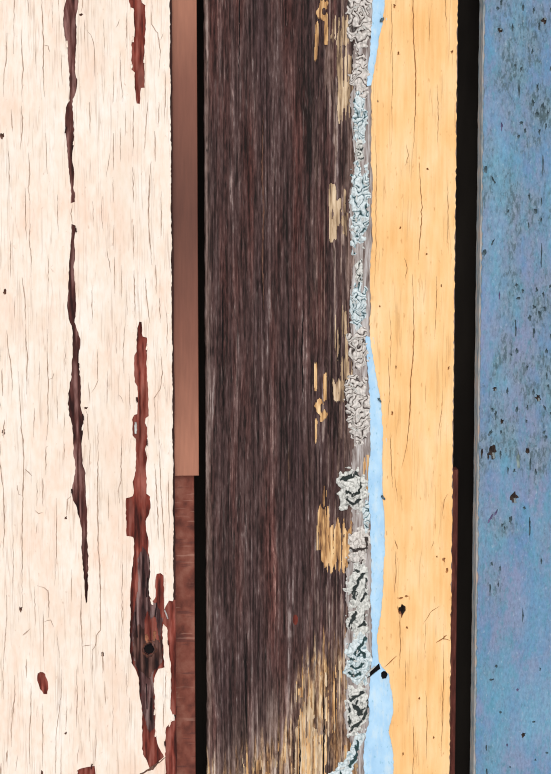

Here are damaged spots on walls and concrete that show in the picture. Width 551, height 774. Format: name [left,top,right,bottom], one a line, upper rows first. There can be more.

peeling [63,0,83,203]
peeling [129,0,146,104]
water stain [330,15,348,46]
peeling [67,224,89,603]
crack [0,0,170,774]
water stain [332,379,350,402]
peeling [126,322,177,774]
peeling [37,672,48,694]
peeling [76,764,96,774]
water stain [290,674,335,774]